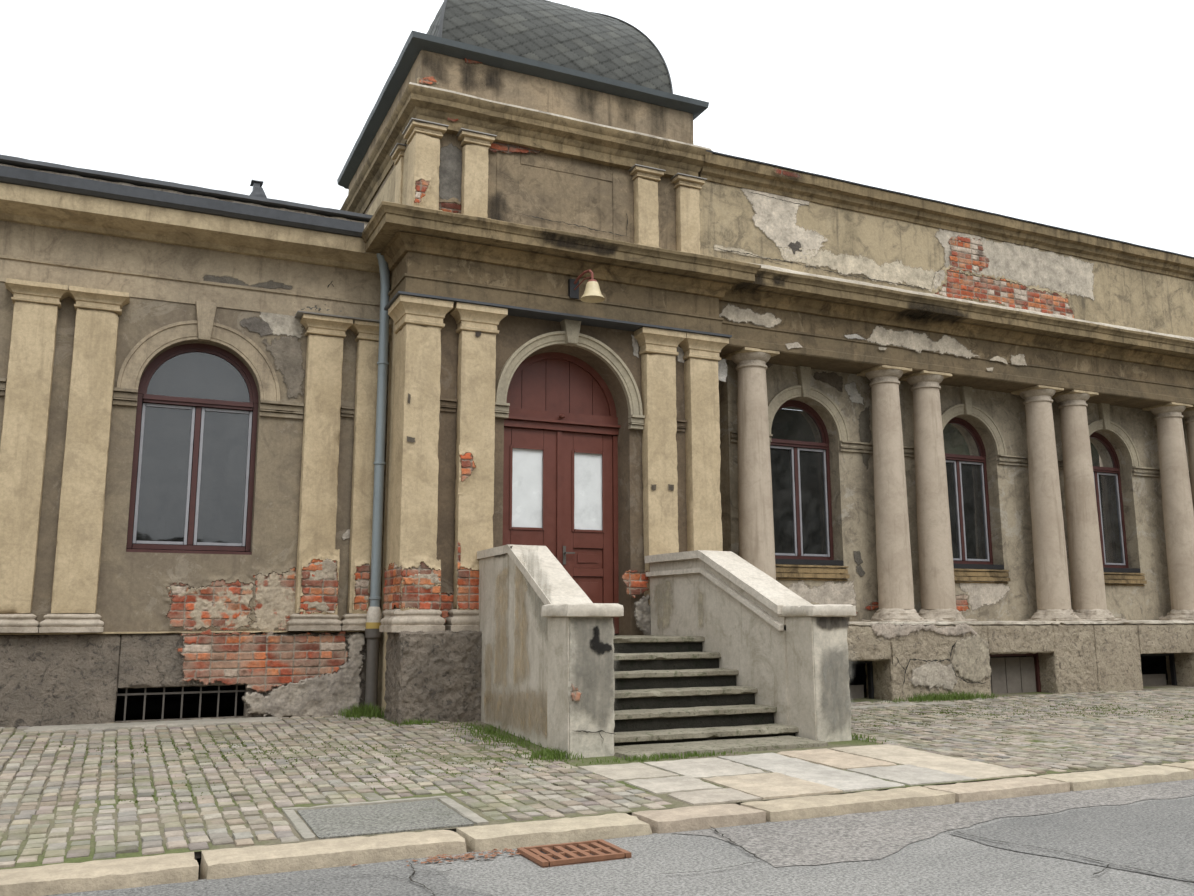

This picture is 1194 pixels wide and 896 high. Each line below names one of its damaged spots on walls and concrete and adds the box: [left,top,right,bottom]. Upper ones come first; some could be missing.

spalling [414,143,462,214]
flaking render [714,245,766,258]
flaking render [741,188,1094,319]
flaking render [719,303,782,328]
flaking render [845,326,1027,371]
flaking render [458,441,476,496]
flaking render [152,547,365,718]
flaking render [352,541,479,626]
flaking render [621,570,651,635]